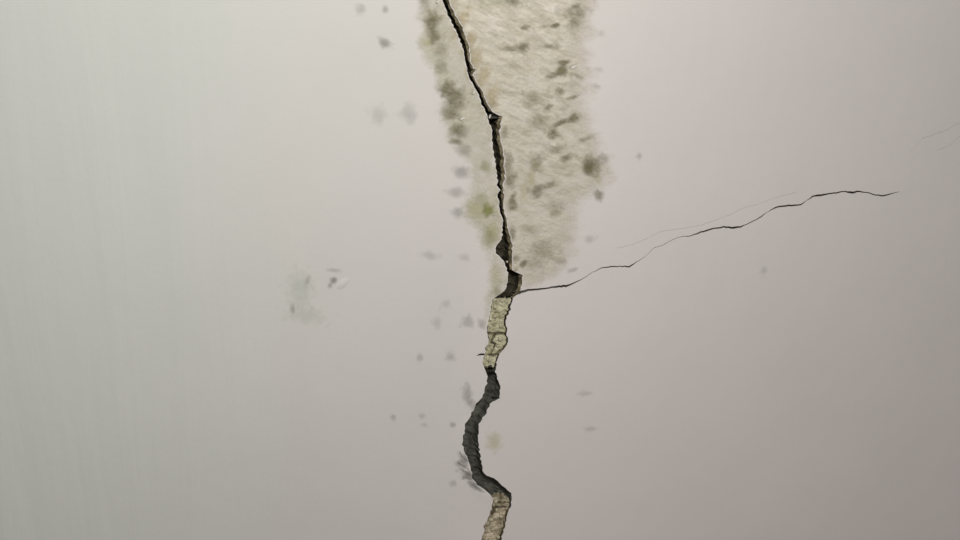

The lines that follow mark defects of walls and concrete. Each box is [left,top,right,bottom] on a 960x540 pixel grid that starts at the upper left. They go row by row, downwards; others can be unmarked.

leakage [420,0,603,283]
crack [436,0,900,540]